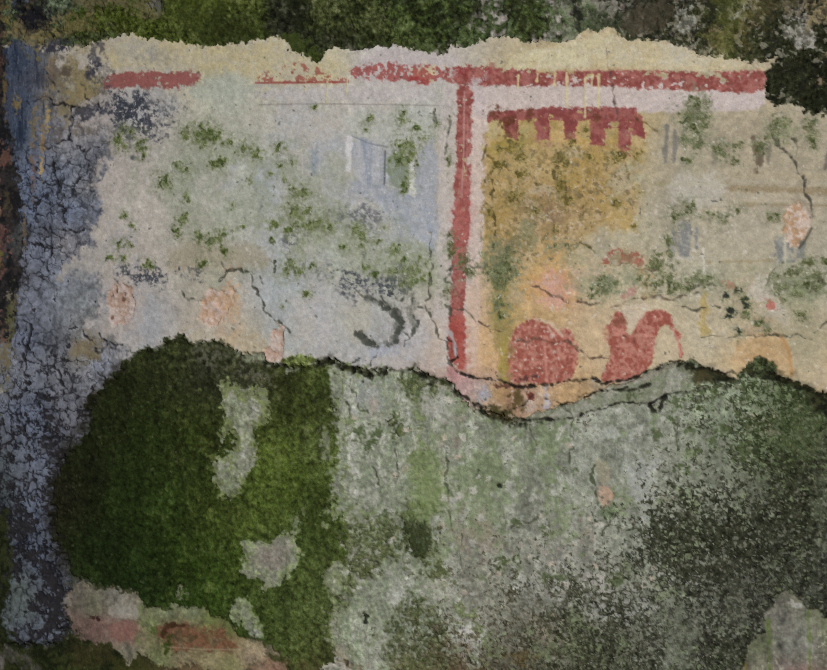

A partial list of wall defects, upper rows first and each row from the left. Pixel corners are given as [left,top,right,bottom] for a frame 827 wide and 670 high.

flaking render [675,4,699,36]
flaking render [781,0,827,51]
crack [772,136,814,213]
crack [641,284,722,313]
crack [0,32,123,648]
spalling [313,358,388,380]
crack [345,389,369,414]
spalling [408,368,460,397]
crack [352,247,682,452]
spalling [479,362,827,429]
crack [669,360,736,376]
spalling [743,590,827,670]